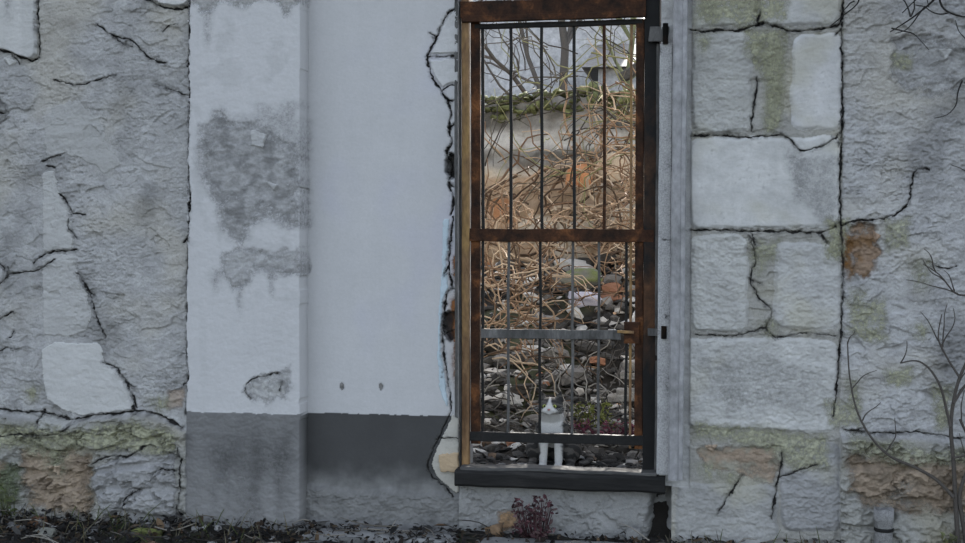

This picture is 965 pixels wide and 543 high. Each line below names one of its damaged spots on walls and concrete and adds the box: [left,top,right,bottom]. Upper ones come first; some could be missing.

crack [0,0,41,65]
crack [97,0,191,128]
peeling [430,6,460,87]
crack [0,193,106,336]
crack [183,152,191,312]
crack [690,0,960,440]
spalling [846,222,882,278]
peeling [432,219,460,493]
spalling [19,447,94,514]
crack [0,350,189,513]
crack [771,452,817,519]
spalling [847,449,965,515]